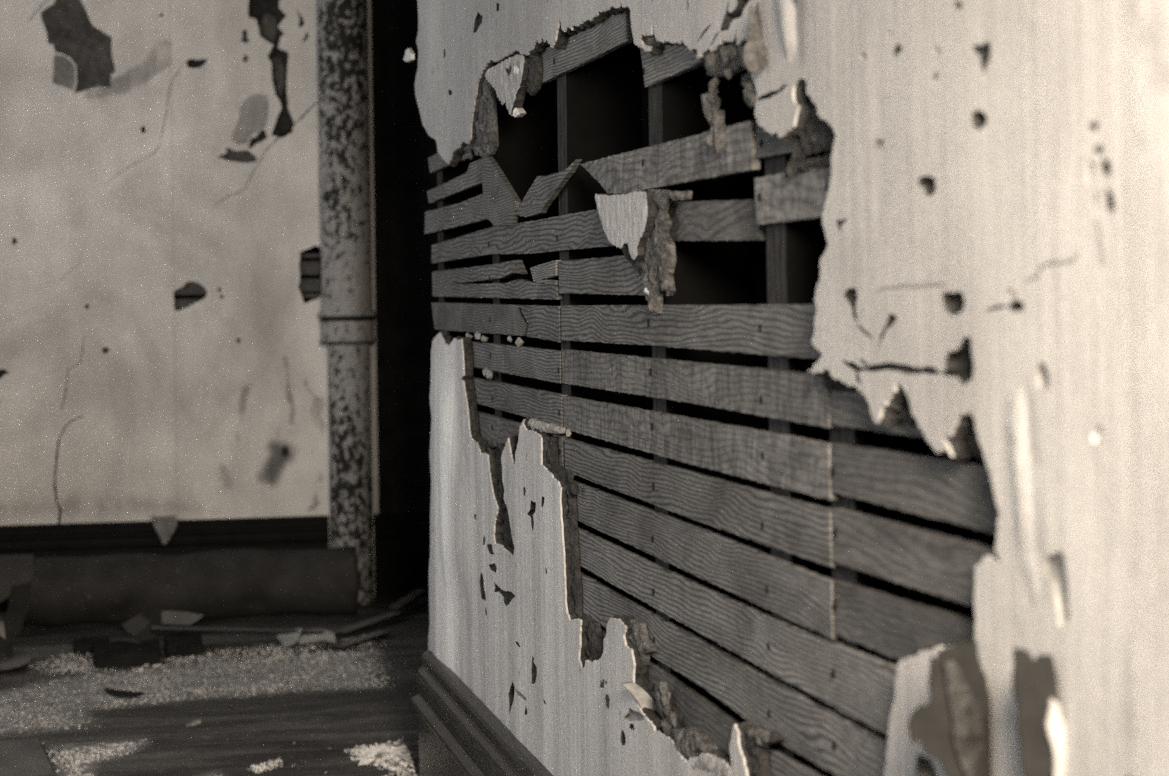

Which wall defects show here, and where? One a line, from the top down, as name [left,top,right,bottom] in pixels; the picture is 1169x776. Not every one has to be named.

spalling [41,0,115,93]
spalling [217,0,309,163]
spalling [448,3,630,167]
spalling [639,2,768,107]
spalling [763,79,836,178]
spalling [298,246,322,303]
spalling [940,336,974,386]
crack [54,337,84,524]
spalling [938,411,986,463]
spalling [437,330,786,776]
peeling [900,638,992,776]
peeling [1012,648,1066,776]